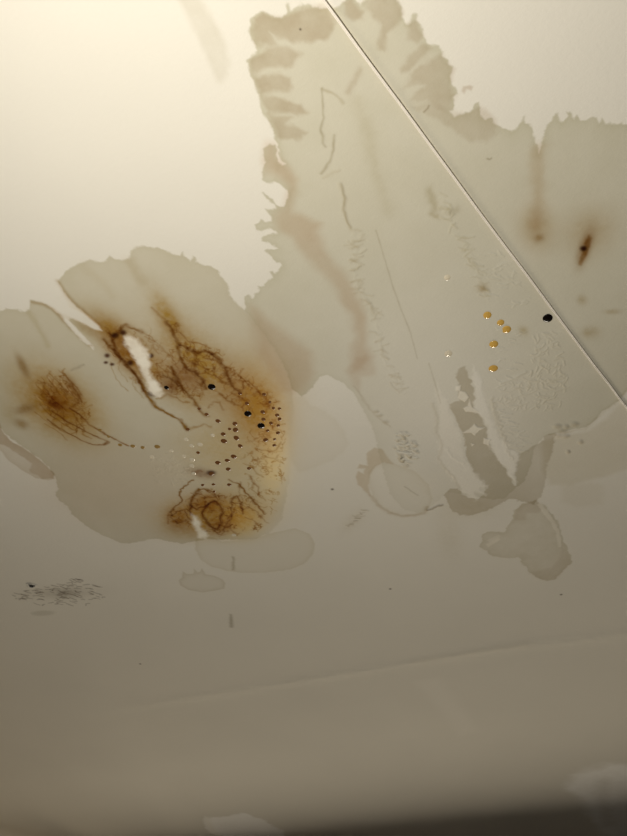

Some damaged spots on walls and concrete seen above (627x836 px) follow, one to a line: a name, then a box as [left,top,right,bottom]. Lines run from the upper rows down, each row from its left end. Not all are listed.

water stain [174,0,627,263]
corrosion [506,188,627,278]
peeling [121,332,166,399]
water stain [0,244,316,593]
corrosion [0,274,327,551]
water stain [427,494,573,582]